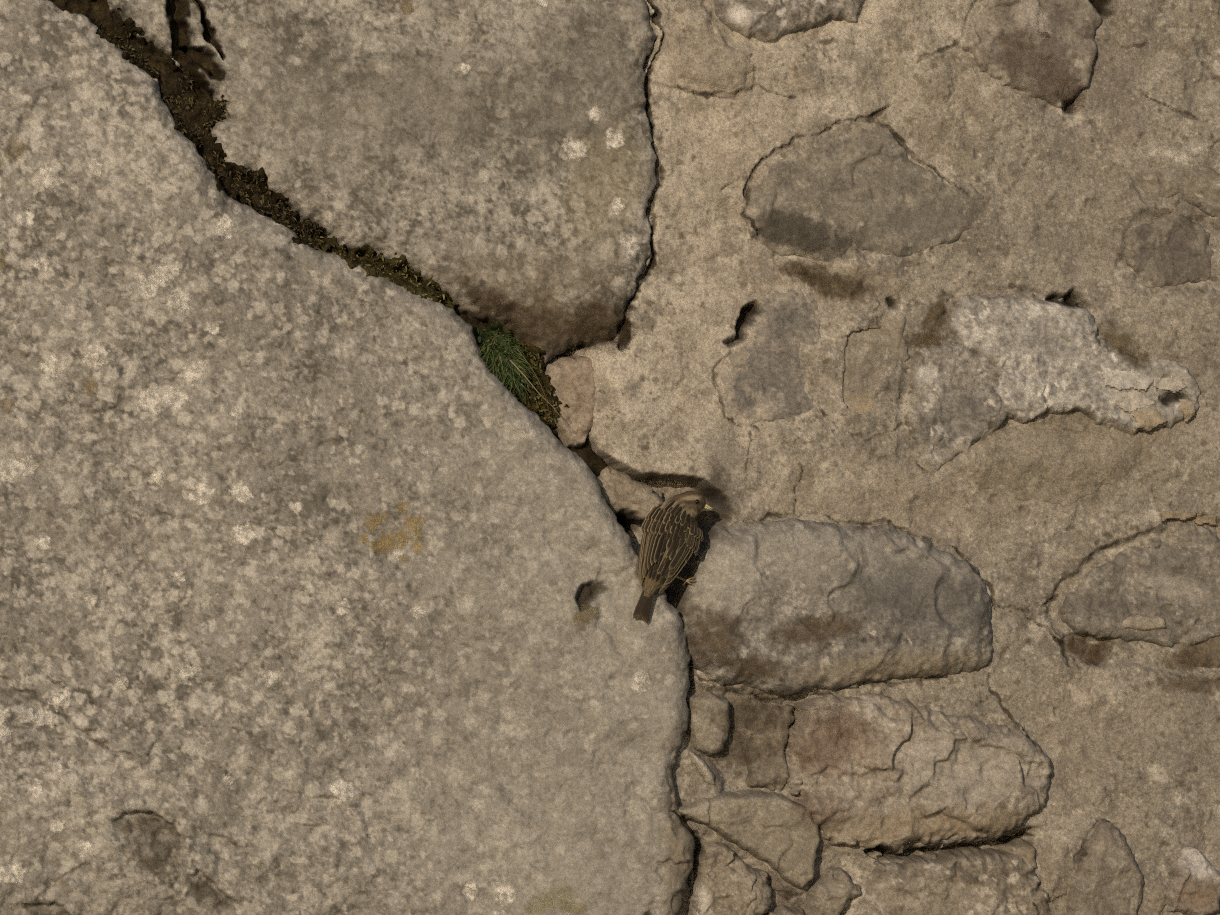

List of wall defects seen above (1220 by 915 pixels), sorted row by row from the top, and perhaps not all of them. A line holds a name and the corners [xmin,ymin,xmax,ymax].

crack [648,2,660,26]
crack [48,0,360,257]
crack [644,67,654,129]
crack [868,108,907,150]
crack [617,166,662,349]
crack [418,280,490,360]
crack [517,399,607,477]